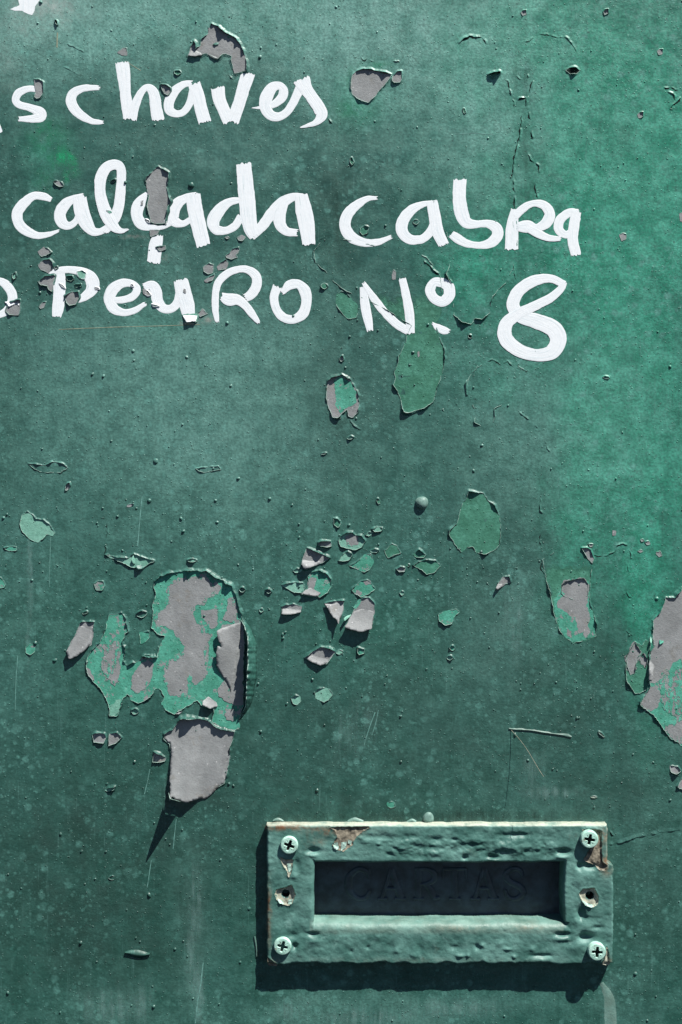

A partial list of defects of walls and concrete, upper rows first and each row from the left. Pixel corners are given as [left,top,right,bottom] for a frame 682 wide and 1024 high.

peeling [186,21,250,75]
peeling [348,66,403,105]
peeling [141,165,173,252]
peeling [313,168,515,421]
peeling [3,510,56,552]
peeling [446,488,502,557]
peeling [280,530,442,632]
peeling [541,543,600,644]
peeling [65,552,257,803]
peeling [303,645,336,667]
peeling [314,686,334,704]
peeling [624,586,682,747]